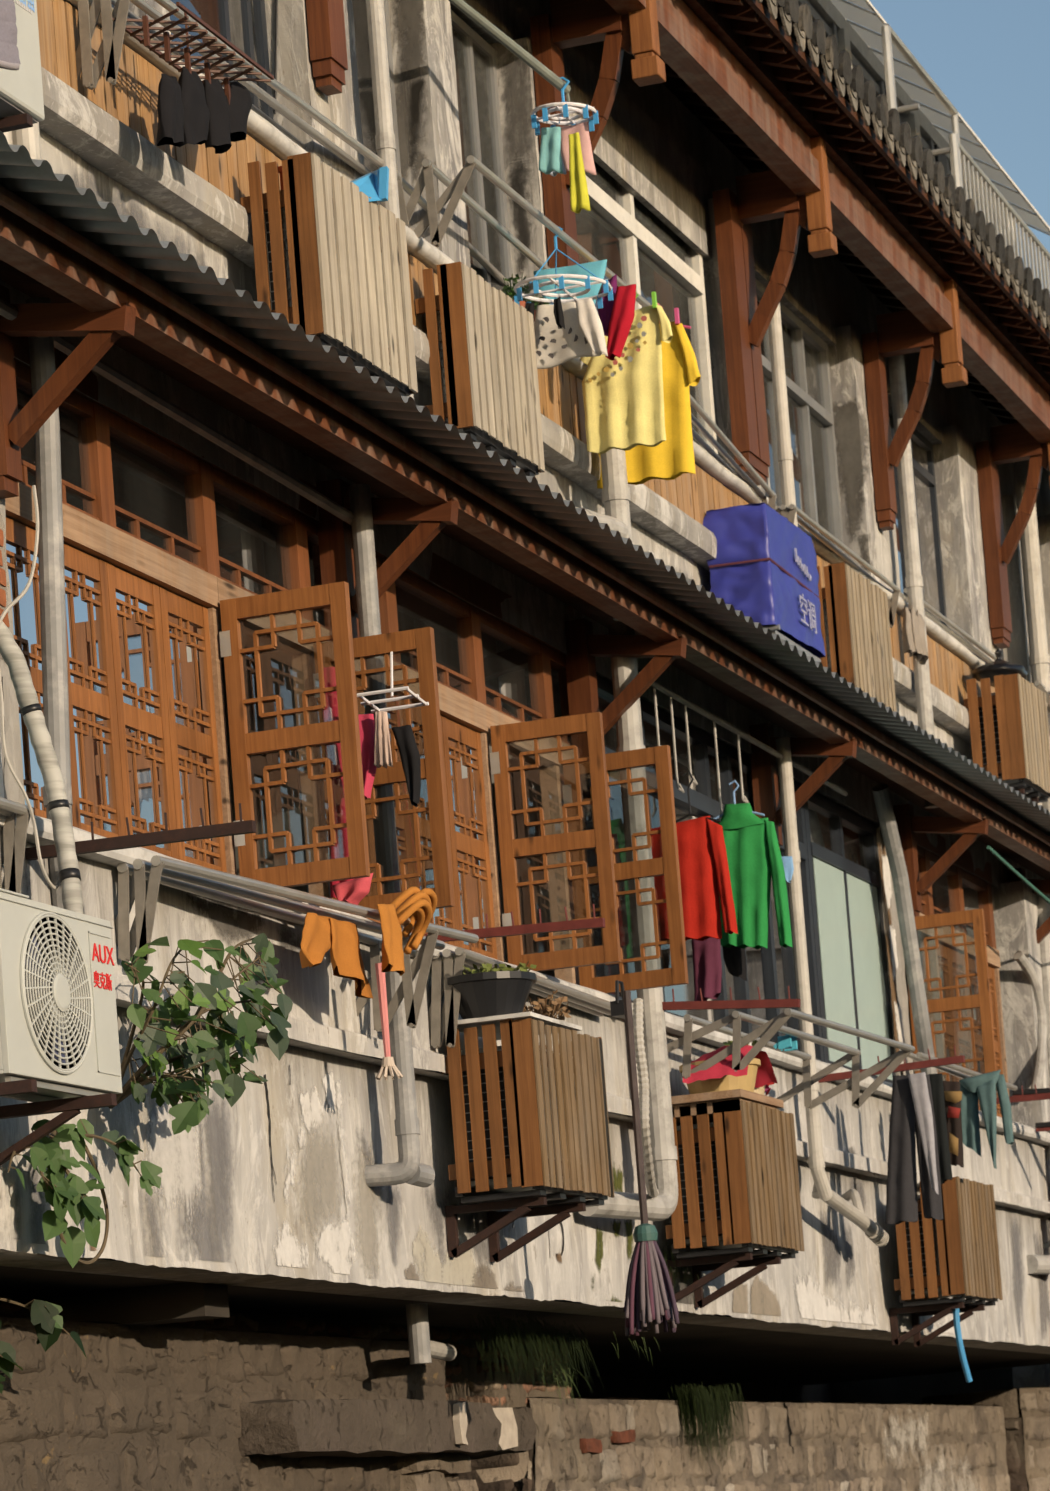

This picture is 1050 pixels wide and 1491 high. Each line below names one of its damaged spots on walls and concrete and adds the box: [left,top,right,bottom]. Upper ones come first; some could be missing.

water stain [146,1096,231,1262]
flaking render [275,1072,378,1279]
water stain [885,1411,976,1491]